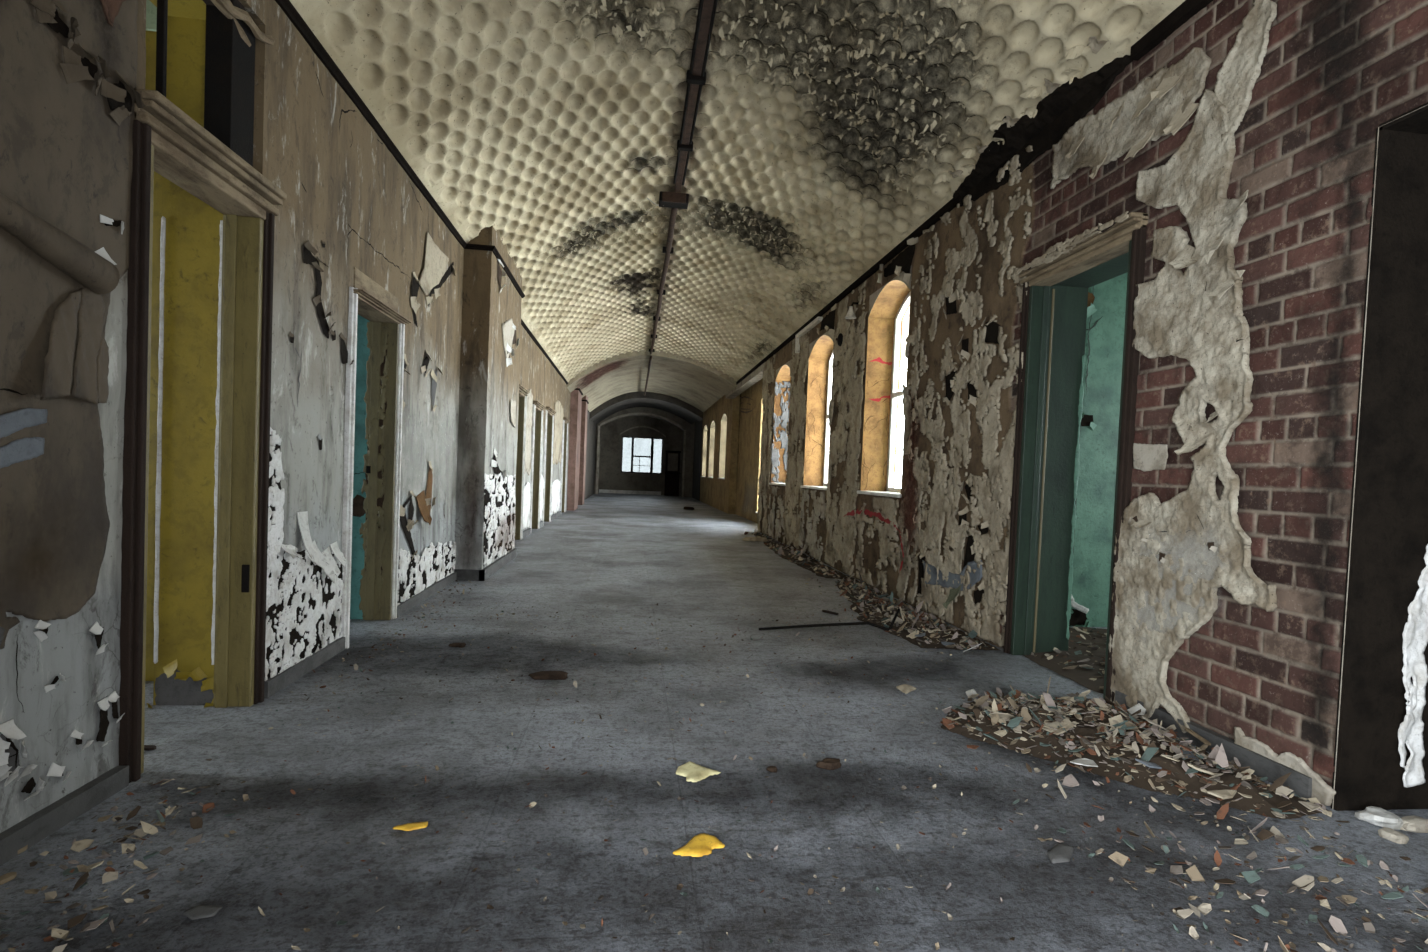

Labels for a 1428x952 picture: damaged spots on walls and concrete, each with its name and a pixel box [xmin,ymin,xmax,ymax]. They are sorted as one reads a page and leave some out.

damp [567,0,674,53]
damp [713,0,987,197]
peeling [0,0,145,649]
damp [560,211,650,257]
damp [610,267,661,317]
damp [697,196,798,267]
flaking render [708,0,1277,733]
peeling [265,232,456,681]
peeling [483,389,564,567]
peeling [1398,544,1428,788]
spalling [0,719,72,801]
flaking render [1234,727,1336,806]